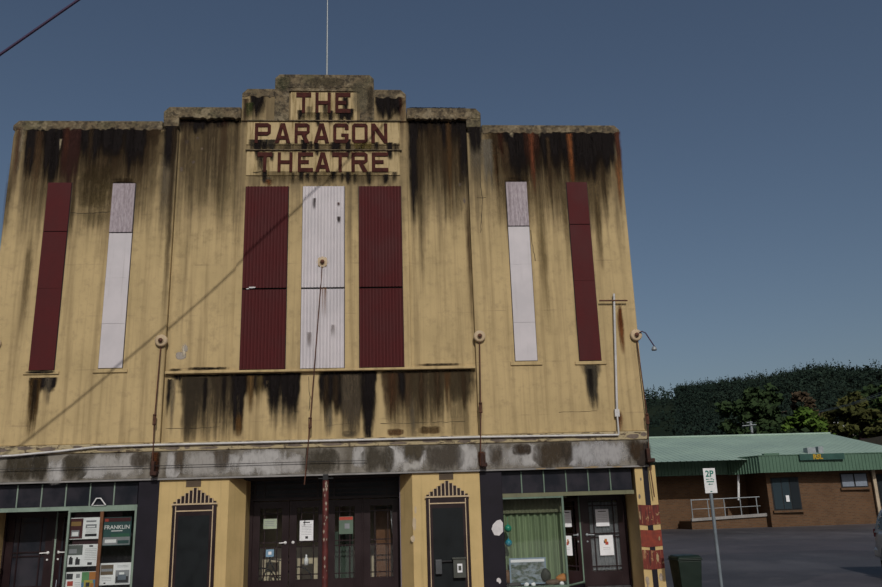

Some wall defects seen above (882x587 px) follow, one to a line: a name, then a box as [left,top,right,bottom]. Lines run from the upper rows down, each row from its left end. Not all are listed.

leakage [316,86,446,126]
leakage [16,96,265,245]
leakage [250,139,275,179]
leakage [301,135,319,159]
leakage [331,120,622,243]
leakage [28,371,57,425]
leakage [166,367,300,436]
leakage [319,363,650,471]
leakage [3,448,339,481]